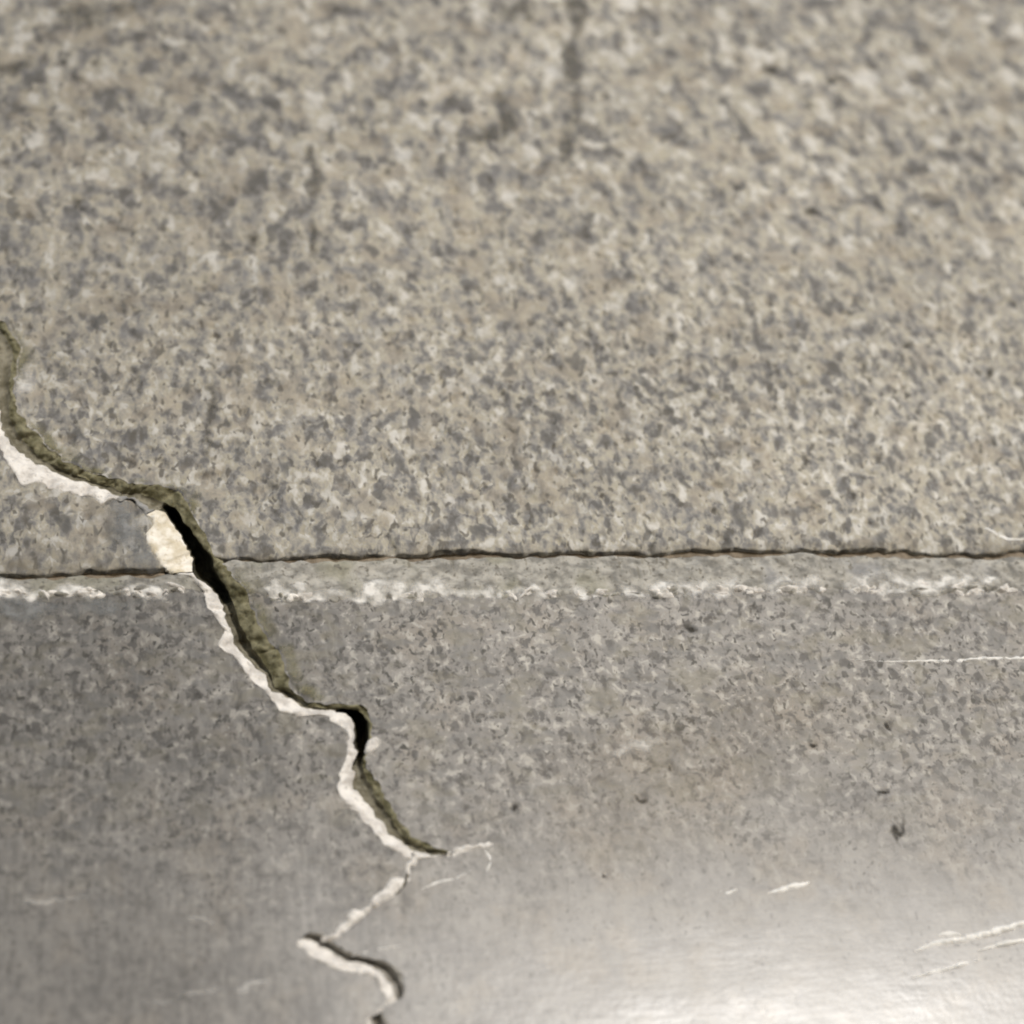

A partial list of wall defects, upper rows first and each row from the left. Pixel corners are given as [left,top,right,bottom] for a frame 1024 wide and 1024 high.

crack [0,321,493,1024]